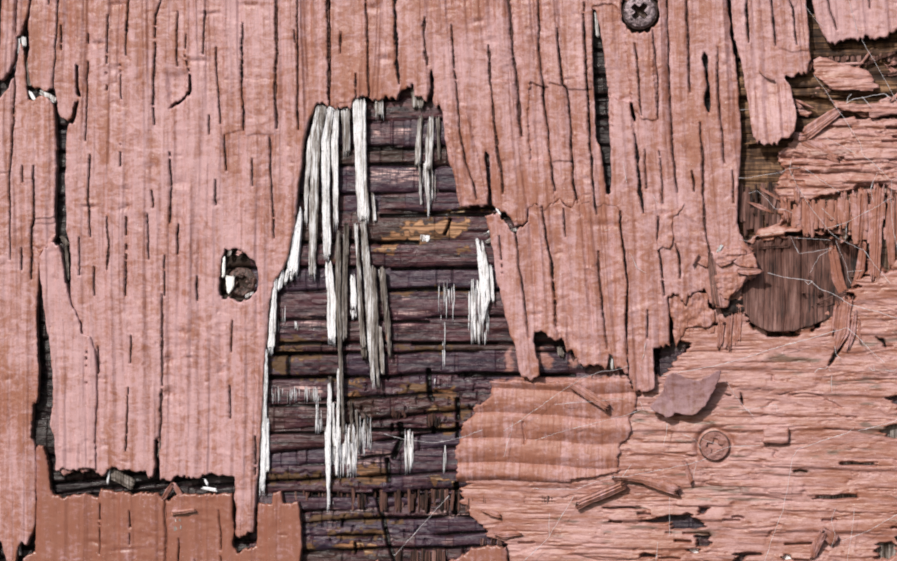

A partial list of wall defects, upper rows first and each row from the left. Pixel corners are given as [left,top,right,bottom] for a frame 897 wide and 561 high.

crack [9,76,35,279]
crack [49,0,62,91]
crack [79,0,179,441]
crack [152,0,245,205]
crack [252,0,299,233]
crack [451,26,477,199]
crack [488,0,522,194]
crack [499,231,528,332]
crack [542,207,566,323]
crack [538,0,597,212]
peeling [249,13,897,561]
crack [598,0,734,354]